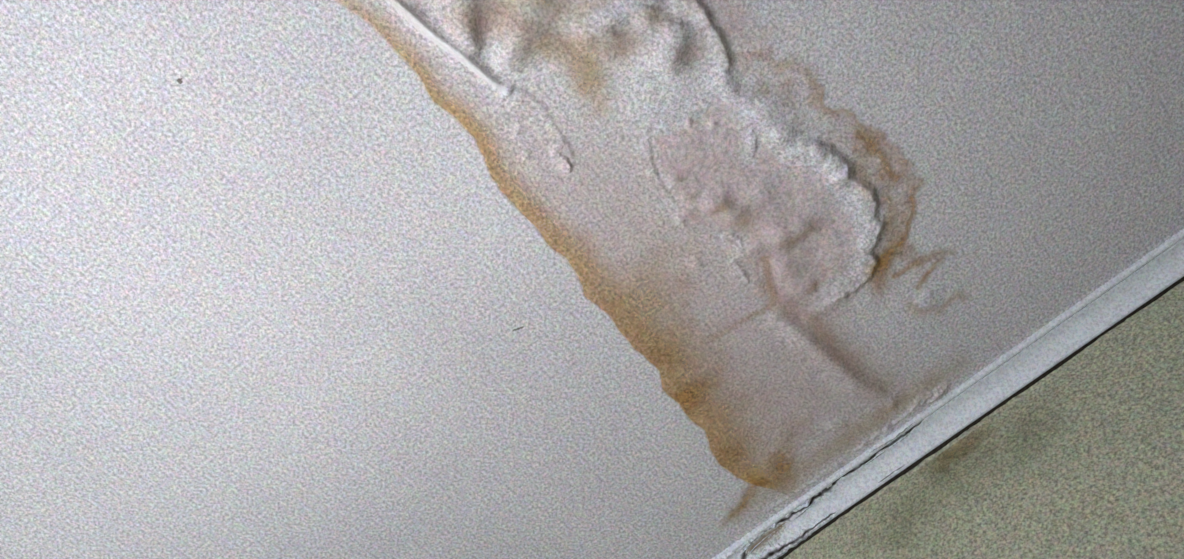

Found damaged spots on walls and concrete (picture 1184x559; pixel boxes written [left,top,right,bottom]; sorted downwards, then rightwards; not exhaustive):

peeling [438,71,592,217]
leakage [406,58,790,516]
leakage [872,248,893,276]